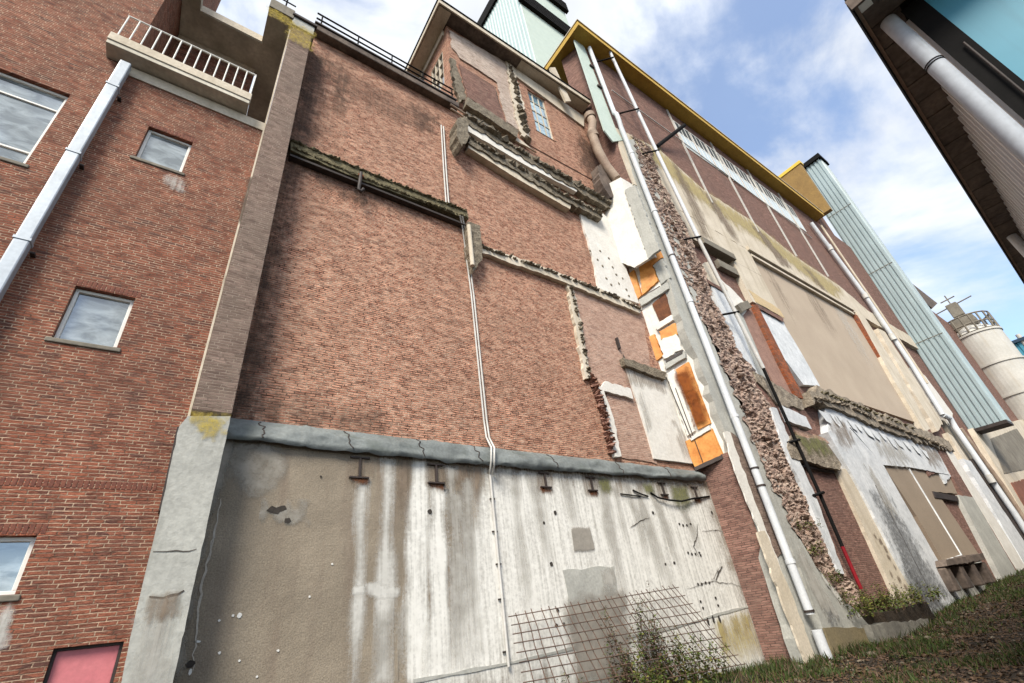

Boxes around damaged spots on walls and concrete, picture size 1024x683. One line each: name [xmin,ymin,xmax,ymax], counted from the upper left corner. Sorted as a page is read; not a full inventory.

crack [149,499,221,670]
spalling [260,500,306,523]
water stain [352,457,481,683]
crack [690,526,742,589]
water stain [872,494,983,613]